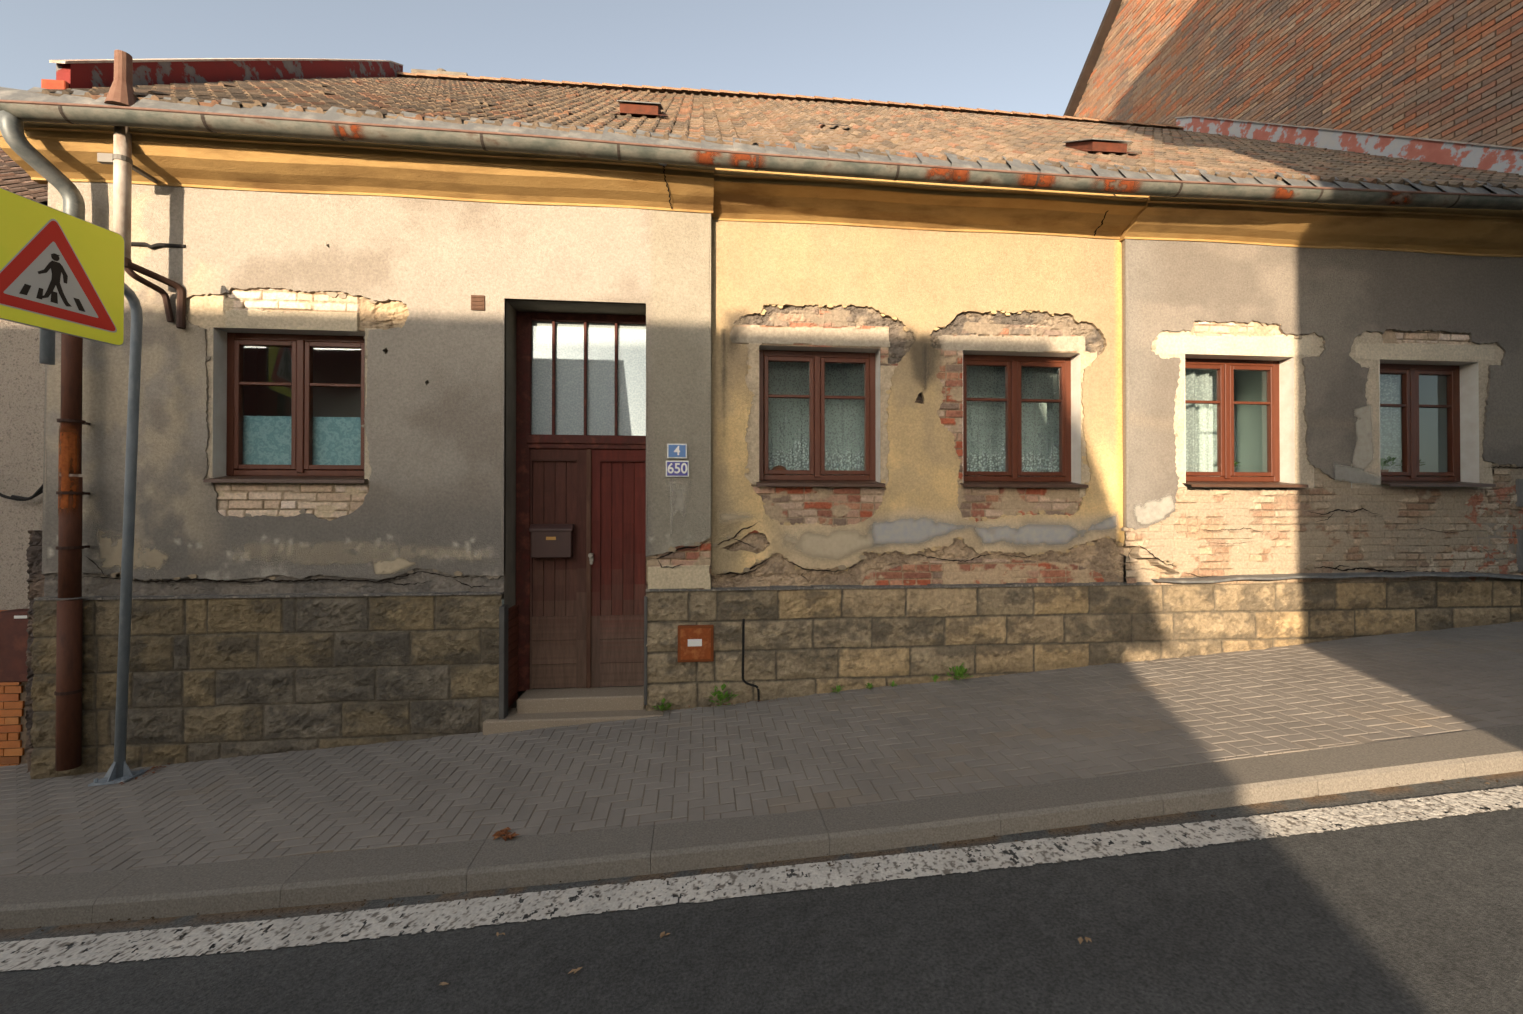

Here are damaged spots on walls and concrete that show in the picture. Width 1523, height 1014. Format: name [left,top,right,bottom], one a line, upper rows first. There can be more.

spalling [186,288,409,521]
spalling [646,304,1523,589]
crack [57,555,496,588]